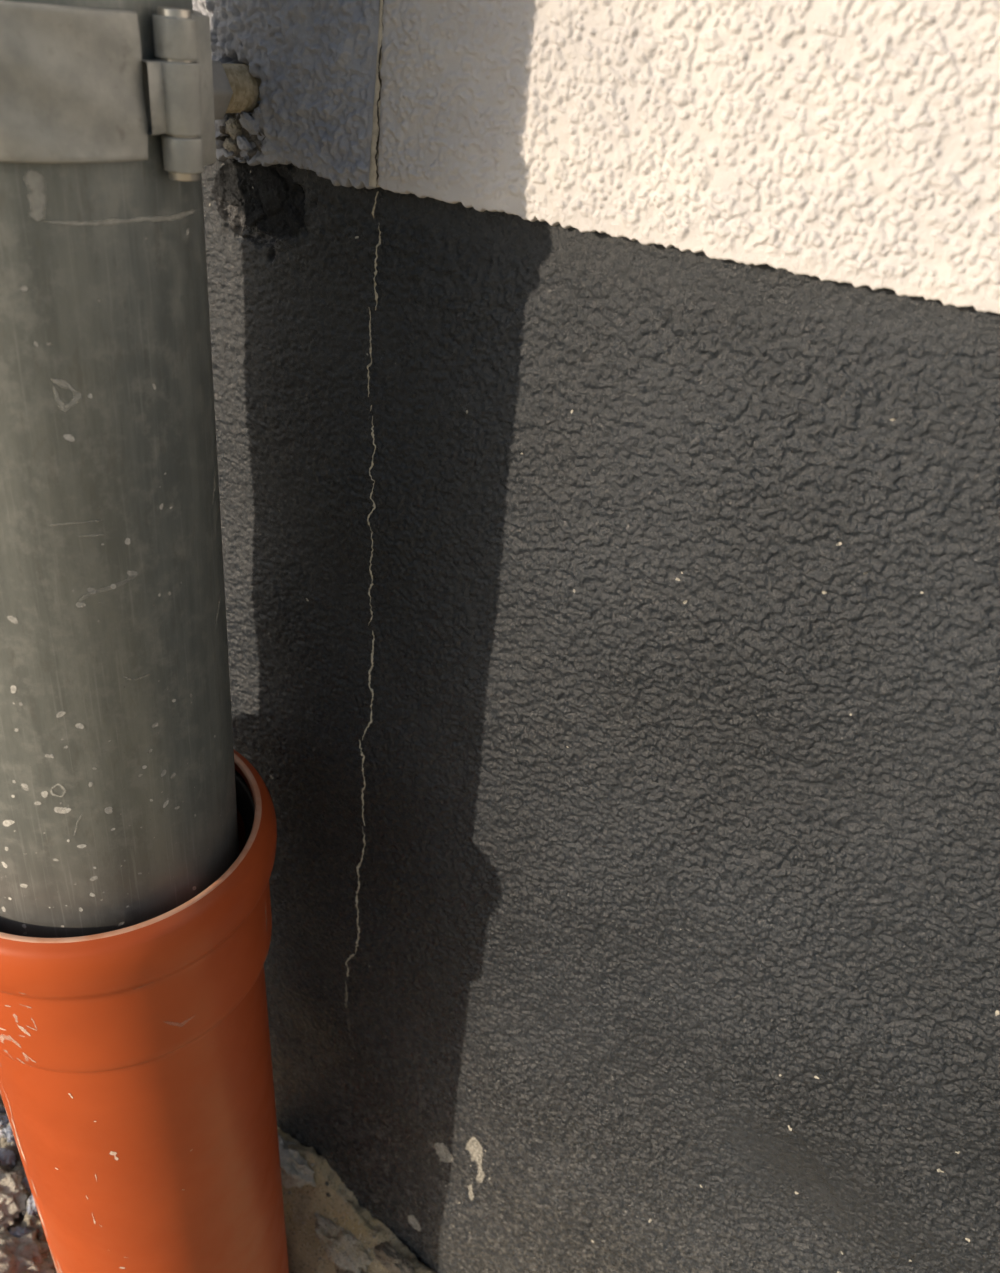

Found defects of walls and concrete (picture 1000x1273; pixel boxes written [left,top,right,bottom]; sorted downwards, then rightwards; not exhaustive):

spalling [211,107,306,251]
crack [345,0,384,977]